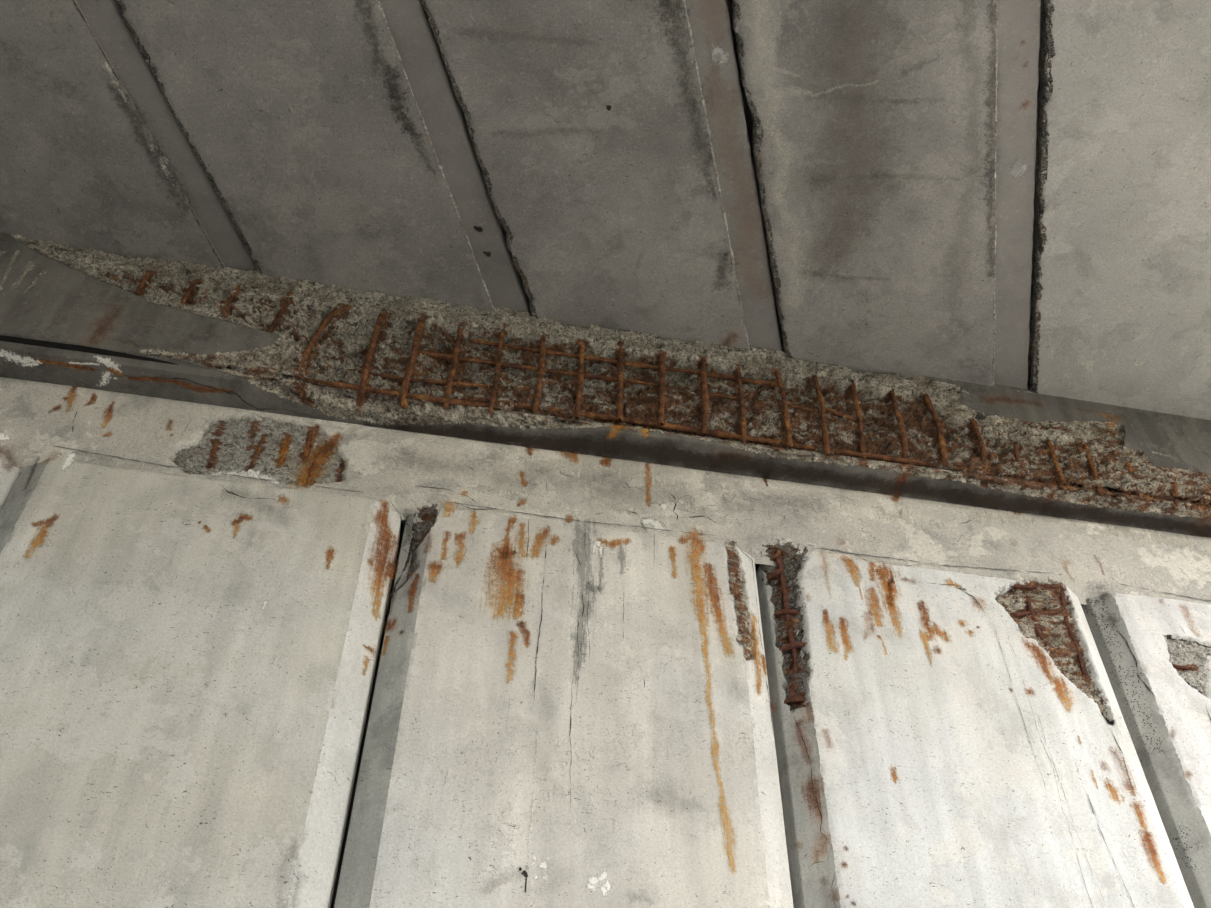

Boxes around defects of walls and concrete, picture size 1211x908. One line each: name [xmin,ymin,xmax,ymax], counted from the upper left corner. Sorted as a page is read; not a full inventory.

spalling [10,0,1211,520]
rust [363,500,478,675]
rust [488,471,560,683]
peeling [640,499,683,532]
rust [669,528,735,872]
spalling [760,537,813,713]
rust [823,610,852,660]
rust [840,556,906,654]
rust [917,600,949,664]
spalling [995,577,1164,754]
spalling [1166,636,1211,698]
rust [1091,751,1166,883]